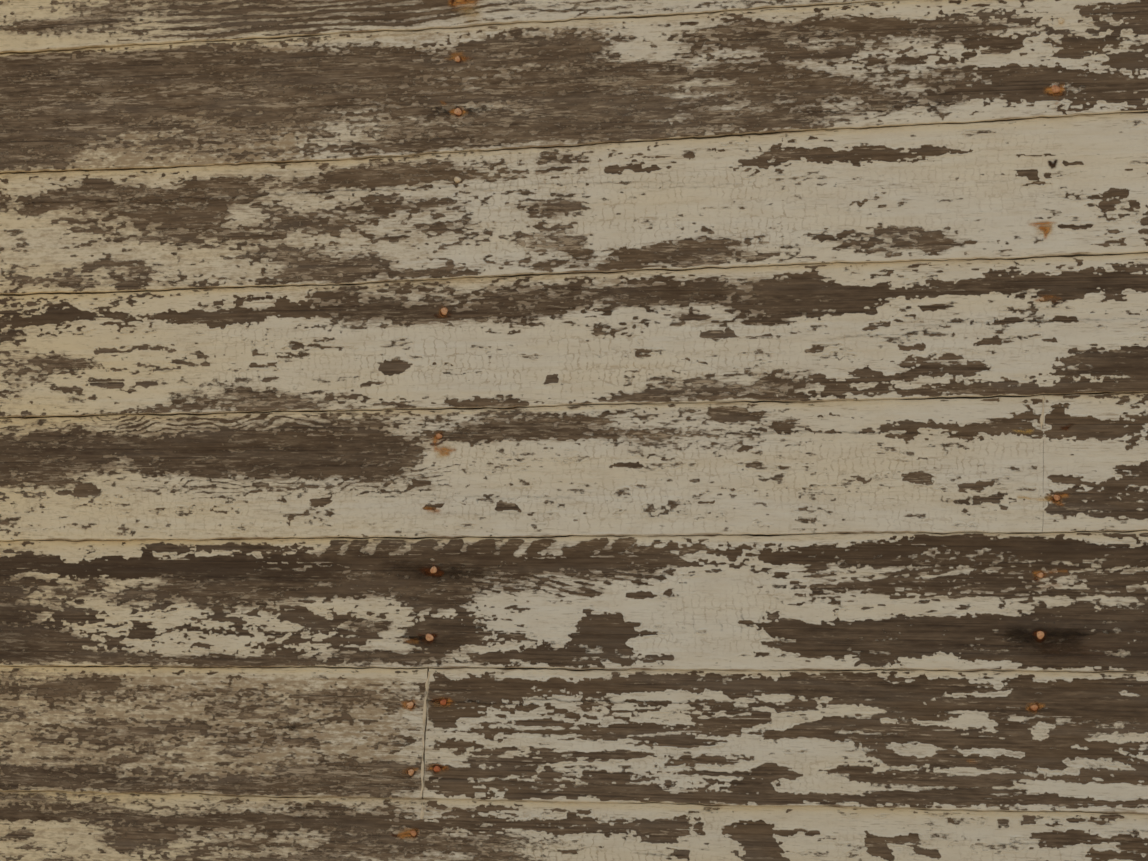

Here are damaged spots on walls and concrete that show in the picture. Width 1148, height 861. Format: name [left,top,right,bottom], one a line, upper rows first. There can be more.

peeling [536,149,593,188]
peeling [602,135,975,193]
peeling [843,184,912,213]
peeling [1001,151,1148,248]
peeling [0,229,28,253]
peeling [360,336,424,388]
peeling [542,372,563,386]
peeling [586,316,666,360]
peeling [802,341,861,362]
peeling [0,512,21,539]
peeling [474,490,547,533]
peeling [640,481,772,531]